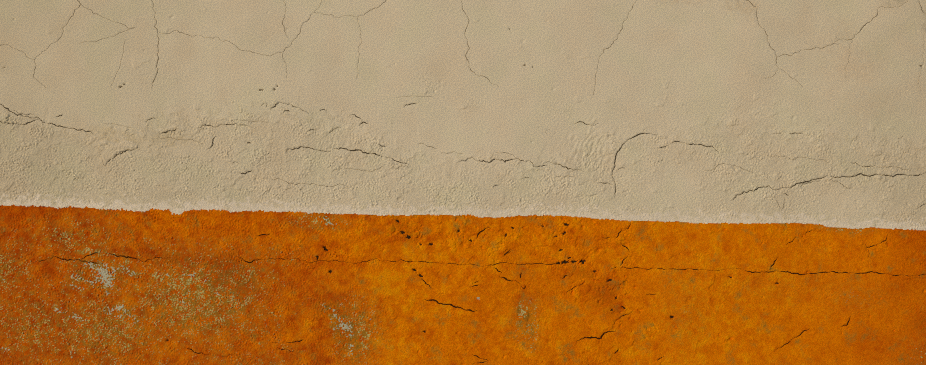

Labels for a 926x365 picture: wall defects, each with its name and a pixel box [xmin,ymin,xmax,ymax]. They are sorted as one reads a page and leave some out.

crack [3,0,386,88]
crack [747,0,926,86]
crack [0,103,409,187]
crack [420,143,573,178]
crack [598,133,920,210]
crack [41,252,169,264]
crack [238,249,583,312]
crack [602,222,926,288]
crack [577,313,630,354]